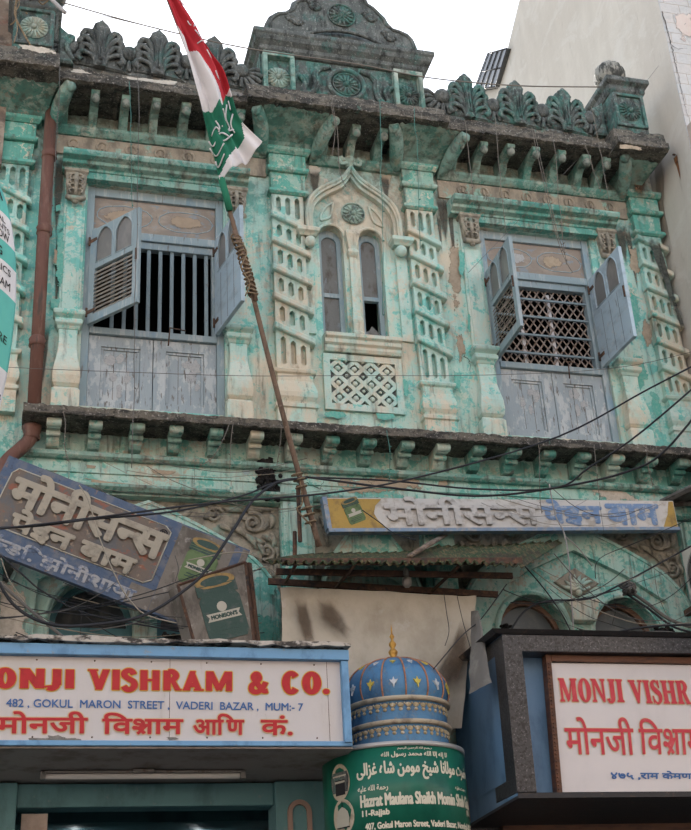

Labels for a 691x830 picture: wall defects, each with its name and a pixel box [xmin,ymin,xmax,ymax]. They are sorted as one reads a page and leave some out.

peeling [19,44,56,54]
peeling [123,76,183,86]
peeling [449,240,465,311]
peeling [628,245,652,347]
peeling [454,314,471,393]
peeling [634,356,663,421]
damp [297,605,313,639]